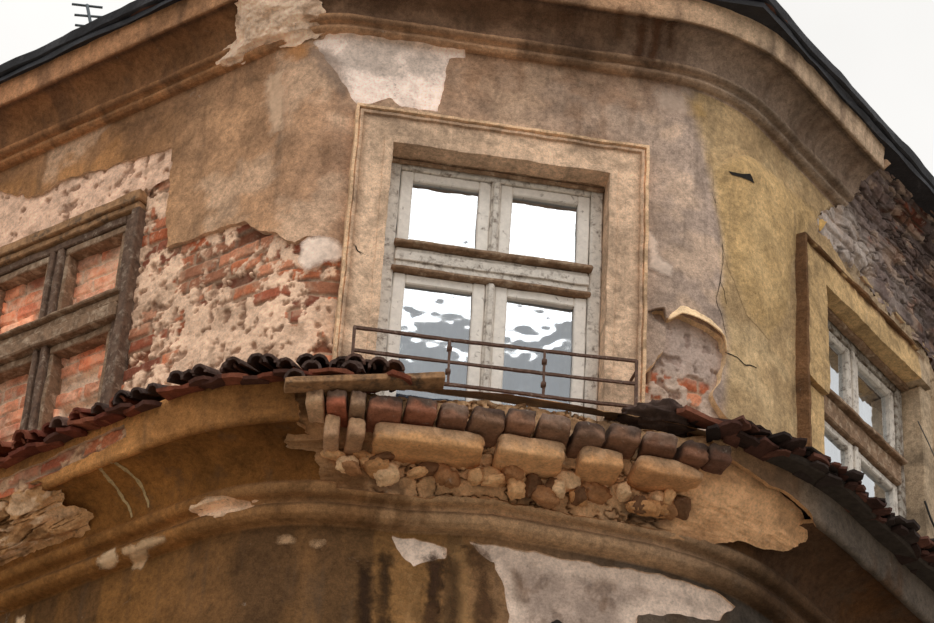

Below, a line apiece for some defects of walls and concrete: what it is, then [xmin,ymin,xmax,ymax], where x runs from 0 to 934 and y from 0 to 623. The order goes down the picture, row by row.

flaking render [308,33,466,111]
flaking render [0,147,342,391]
crack [716,243,757,368]
flaking render [645,306,728,419]
flaking render [828,239,934,464]
flaking render [0,424,126,498]
flaking render [295,389,816,527]
damp [358,553,393,623]
flaking render [392,536,447,566]
damp [404,544,495,623]
flaking render [469,541,735,623]